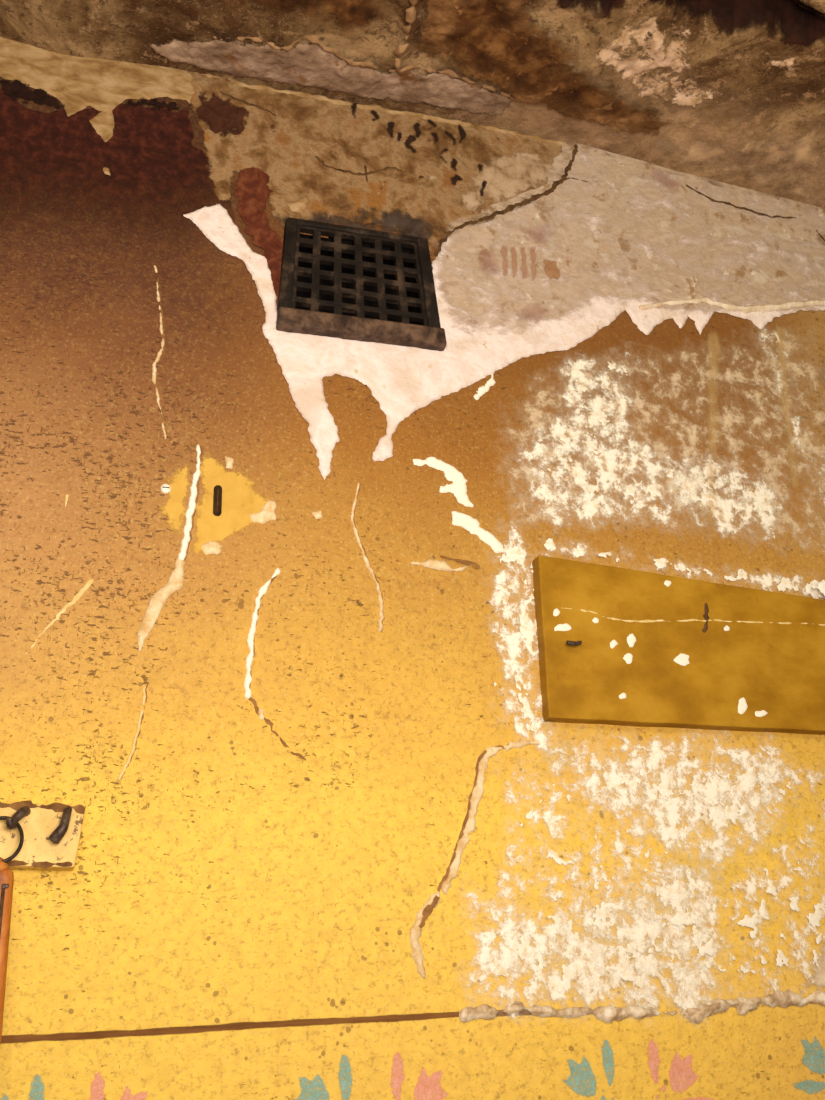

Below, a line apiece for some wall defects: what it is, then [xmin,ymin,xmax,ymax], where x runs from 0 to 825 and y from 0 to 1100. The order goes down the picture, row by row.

damp [651,0,825,47]
damp [0,88,249,203]
spalling [0,0,825,480]
mould [371,110,466,185]
crack [435,144,587,256]
damp [438,131,825,328]
crack [152,265,167,439]
crack [178,445,203,560]
peeling [413,457,504,553]
crack [244,568,306,760]
damp [466,329,825,1019]
crack [437,740,540,895]